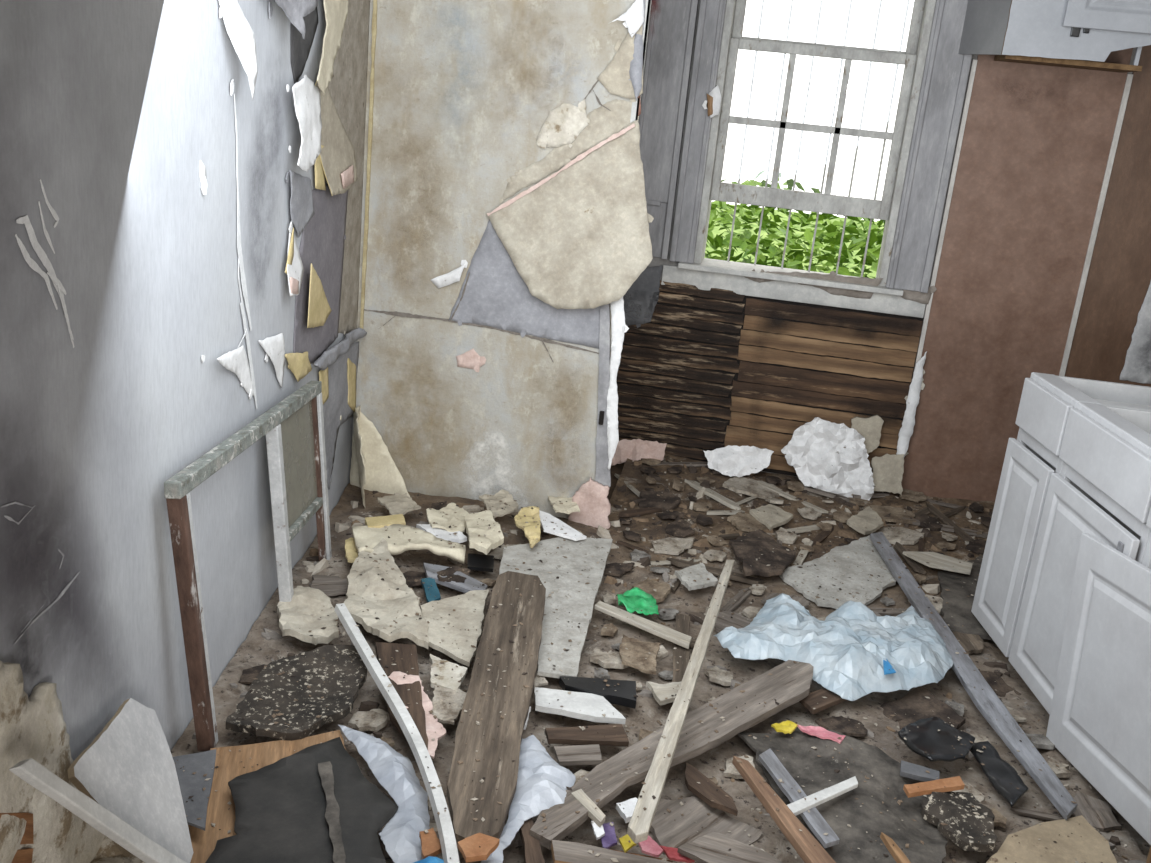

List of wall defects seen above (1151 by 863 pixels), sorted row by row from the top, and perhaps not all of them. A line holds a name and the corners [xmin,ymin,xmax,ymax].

flaking render [537,99,590,149]
flaking render [288,0,370,369]
flaking render [431,260,468,289]
peeling [1119,281,1151,384]
flaking render [0,661,105,863]